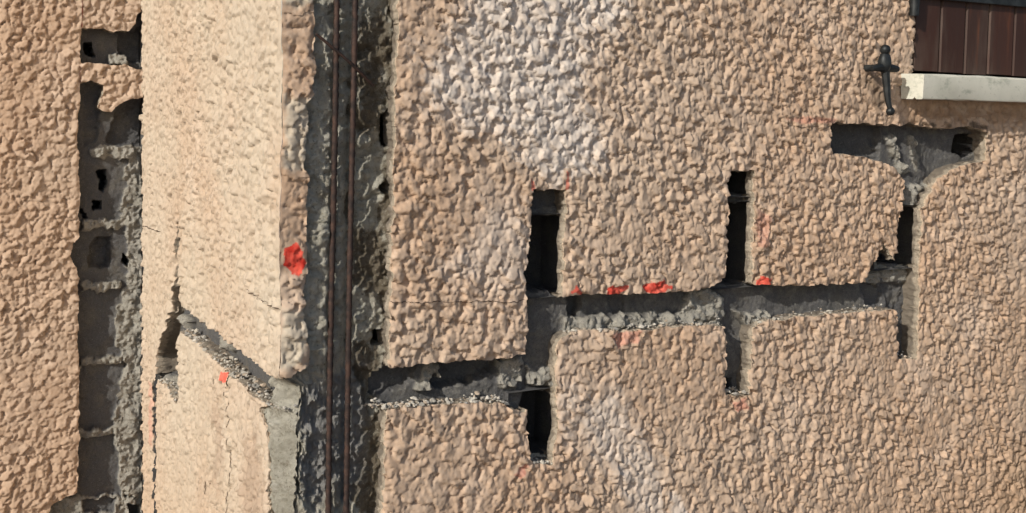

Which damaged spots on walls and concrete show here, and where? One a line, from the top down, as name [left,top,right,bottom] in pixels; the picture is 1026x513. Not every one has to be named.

flaking render [80,13,141,70]
spalling [78,169,106,225]
spalling [260,0,400,513]